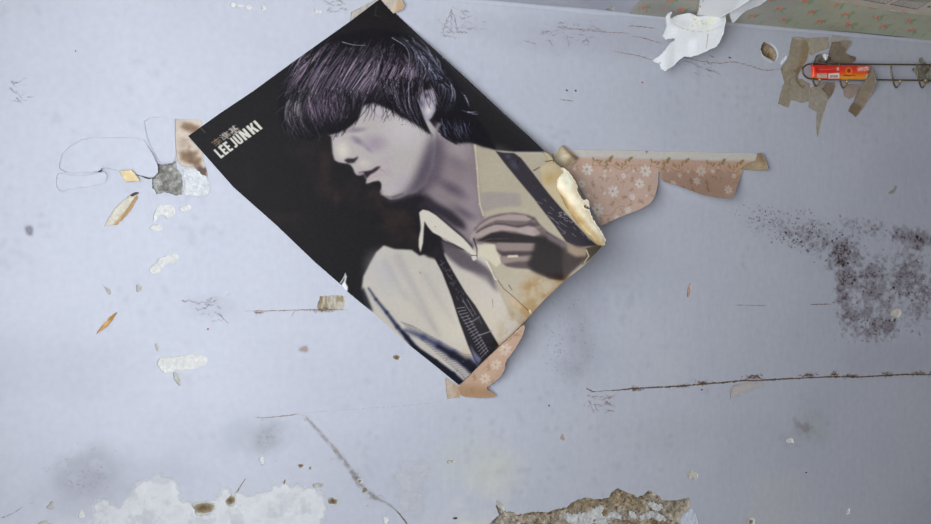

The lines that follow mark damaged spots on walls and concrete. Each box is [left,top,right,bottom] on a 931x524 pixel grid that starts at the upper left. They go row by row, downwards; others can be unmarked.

peeling [56,117,210,231]
water stain [753,210,931,336]
crack [586,371,931,398]
spalling [192,494,236,516]
crack [255,414,407,524]
spalling [490,488,698,524]